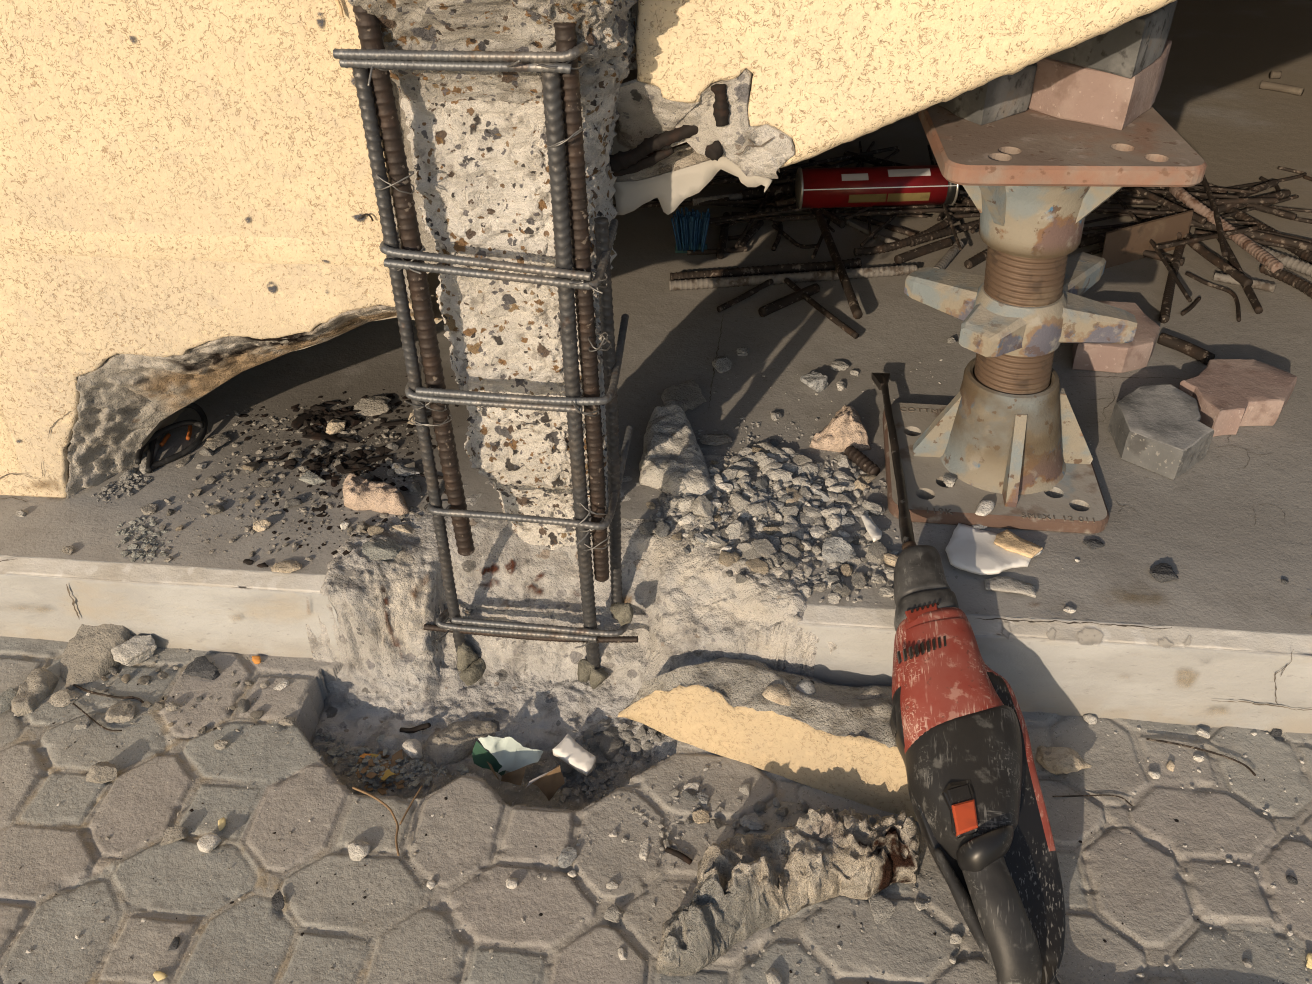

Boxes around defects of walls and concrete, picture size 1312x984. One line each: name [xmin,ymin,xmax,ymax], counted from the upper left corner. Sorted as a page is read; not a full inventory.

corrosion [353,5,385,50]
spalling [335,0,795,215]
spalling [65,188,414,499]
corrosion [368,68,475,556]
corrosion [553,22,610,582]
corrosion [381,588,399,647]
peeling [391,524,414,533]
corrosion [479,560,515,586]